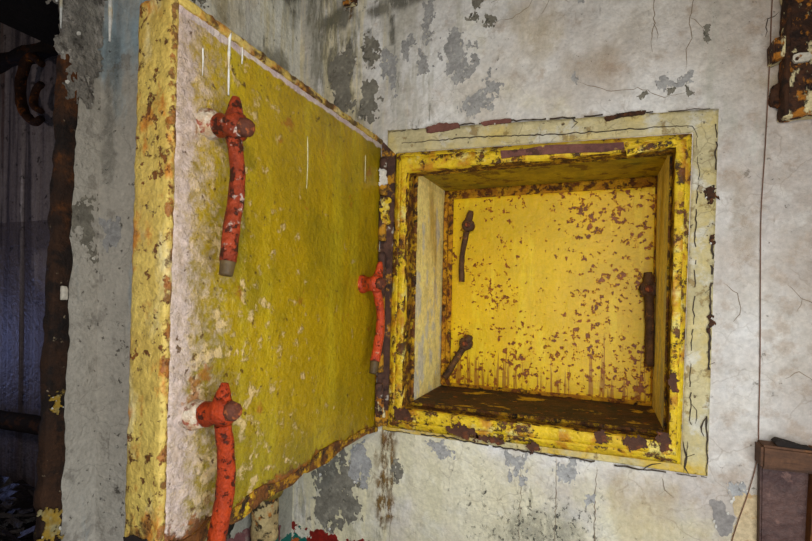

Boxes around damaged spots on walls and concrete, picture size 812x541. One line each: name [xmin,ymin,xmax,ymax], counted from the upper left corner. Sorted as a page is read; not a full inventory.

peeling [465,0,497,28]
peeling [327,0,480,124]
peeling [457,67,512,126]
peeling [604,70,695,122]
peeling [426,122,460,133]
corrosion [169,516,211,541]
corrosion [229,426,394,528]
peeling [278,439,372,541]
peeling [390,458,404,485]
peeling [504,450,529,487]
peeling [552,459,585,485]
peeling [709,481,757,541]